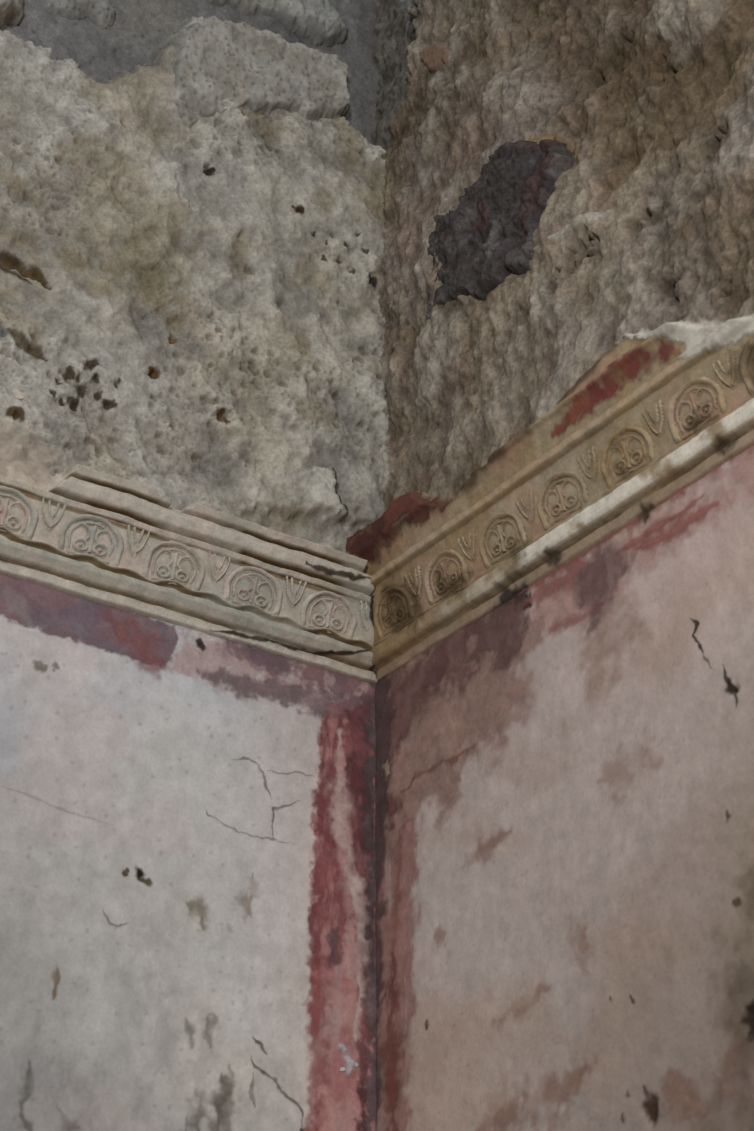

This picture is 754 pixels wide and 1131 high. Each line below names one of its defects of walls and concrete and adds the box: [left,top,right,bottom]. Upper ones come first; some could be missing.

crack [689,617,739,706]
crack [232,757,300,843]
water stain [359,599,540,1131]
crack [251,1039,304,1131]
spalling [643,1085,658,1123]